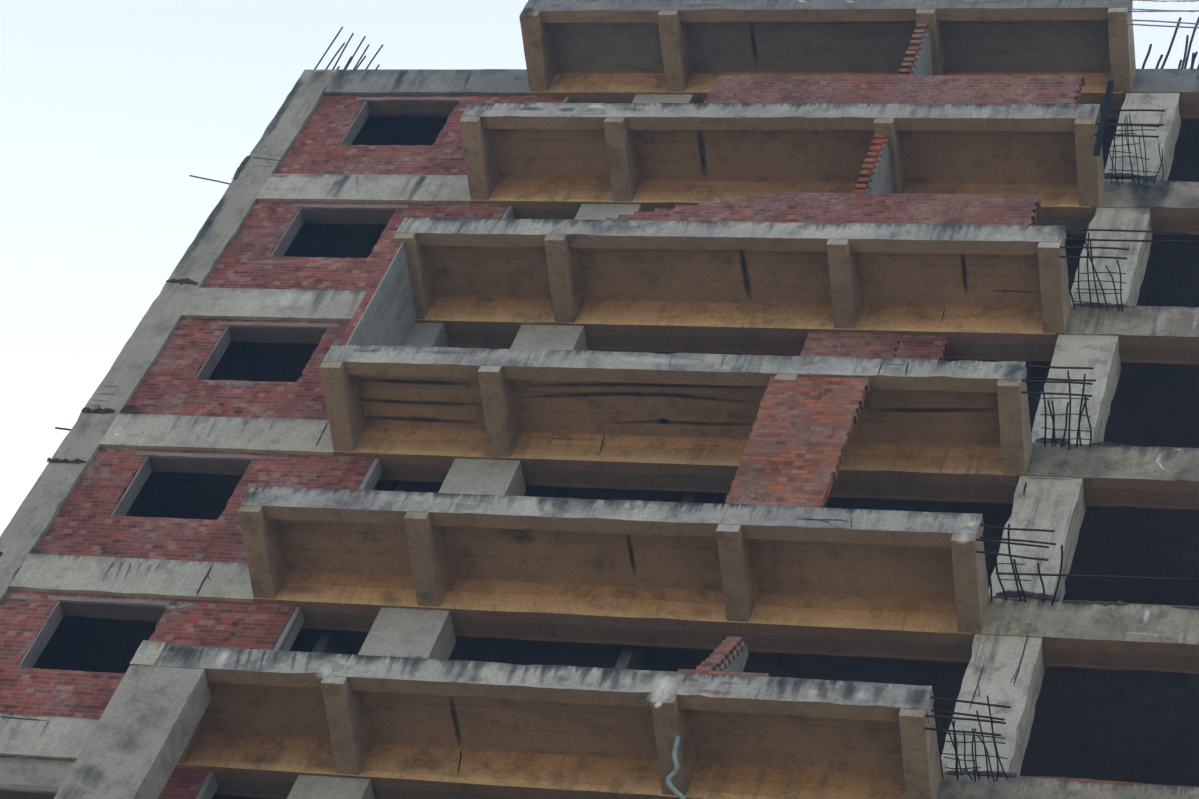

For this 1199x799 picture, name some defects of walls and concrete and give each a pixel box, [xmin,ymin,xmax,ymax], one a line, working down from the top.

crack [196,563,213,596]
water stain [654,678,672,706]
crack [0,753,68,761]